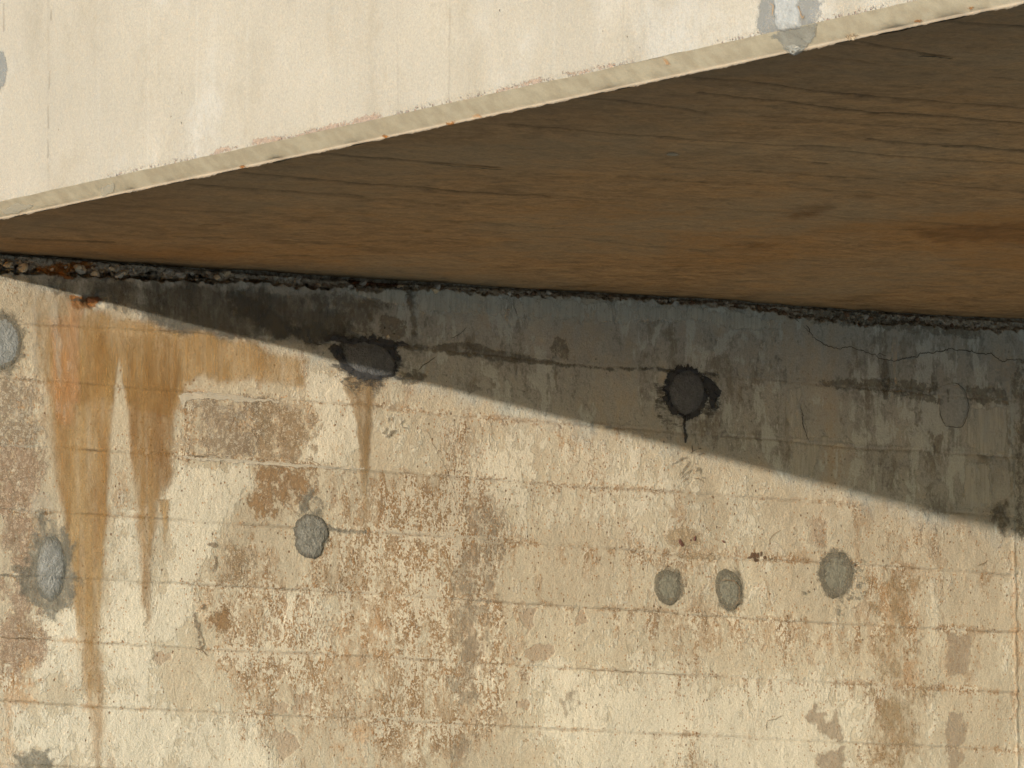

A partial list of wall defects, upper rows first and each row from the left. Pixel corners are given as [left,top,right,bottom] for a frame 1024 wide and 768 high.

rust [36,261,96,280]
spalling [0,253,1024,339]
crack [787,315,1021,362]
rust [344,378,374,473]
rust [51,295,302,690]